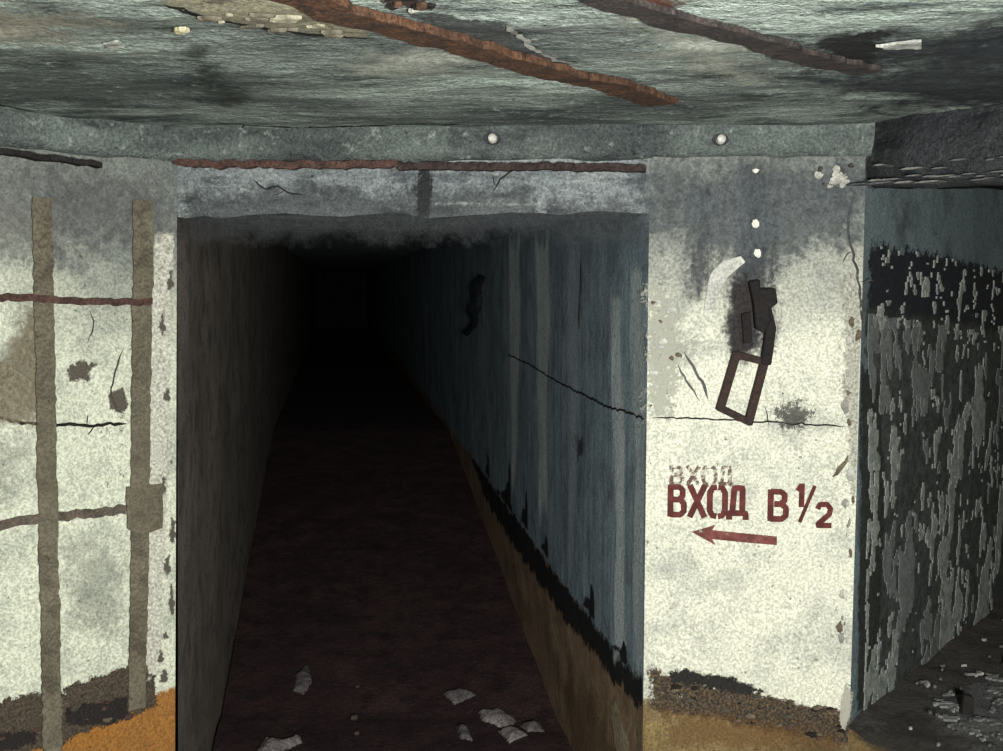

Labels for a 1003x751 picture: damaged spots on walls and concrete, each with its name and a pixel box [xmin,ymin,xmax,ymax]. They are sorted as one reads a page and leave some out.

spalling [163,0,378,39]
spalling [0,691,43,751]
peeling [60,231,176,745]
spalling [472,458,849,745]
crack [507,354,843,427]
peeling [840,240,1003,751]